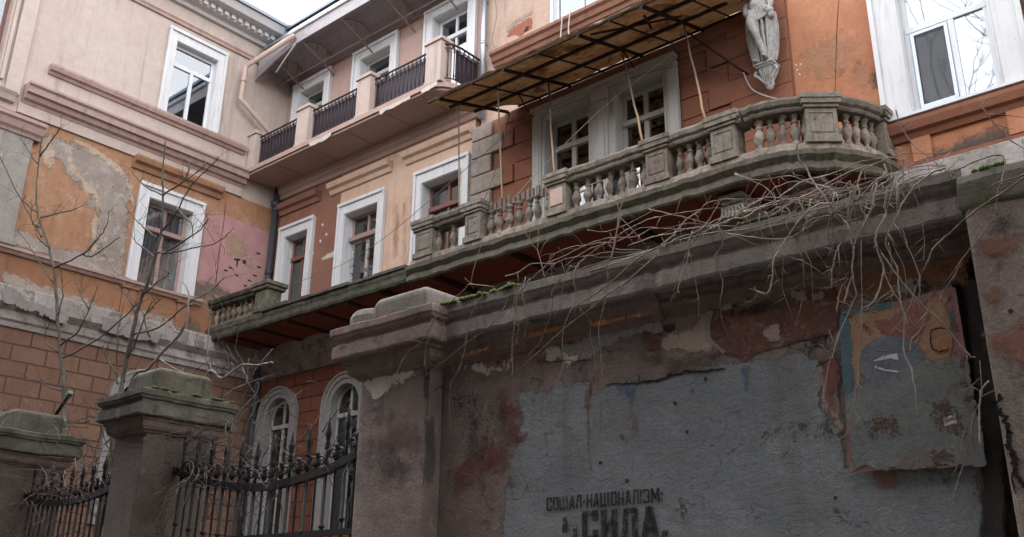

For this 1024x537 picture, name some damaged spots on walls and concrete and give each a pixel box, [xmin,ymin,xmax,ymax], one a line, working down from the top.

peeling [13,131,135,277]
peeling [0,287,69,325]
peeling [101,316,162,343]
peeling [364,370,420,400]
water stain [368,367,521,493]
flaking render [643,252,972,363]